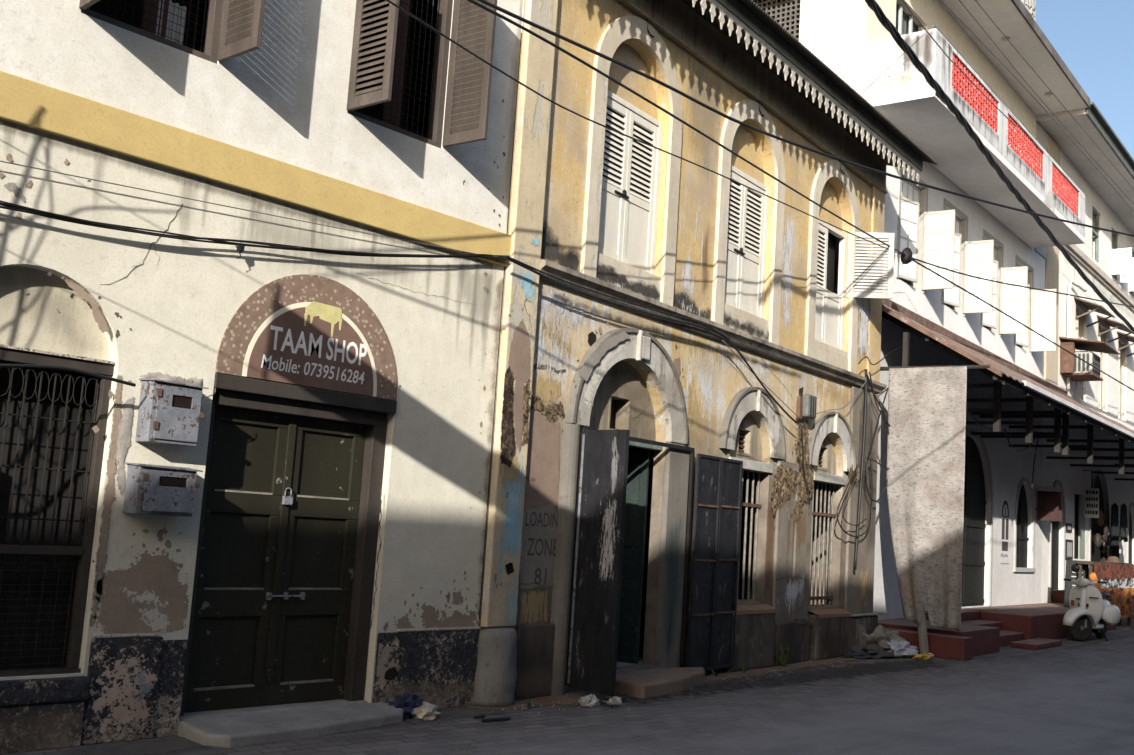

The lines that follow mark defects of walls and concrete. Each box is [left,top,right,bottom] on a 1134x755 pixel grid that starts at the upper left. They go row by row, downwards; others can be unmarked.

flaking render [47,271,131,338]
crack [100,204,183,285]
damp [541,223,802,364]
flaking render [494,269,633,625]
damp [565,328,688,444]
damp [719,387,786,459]
peeling [79,375,189,741]
peeling [375,571,480,700]